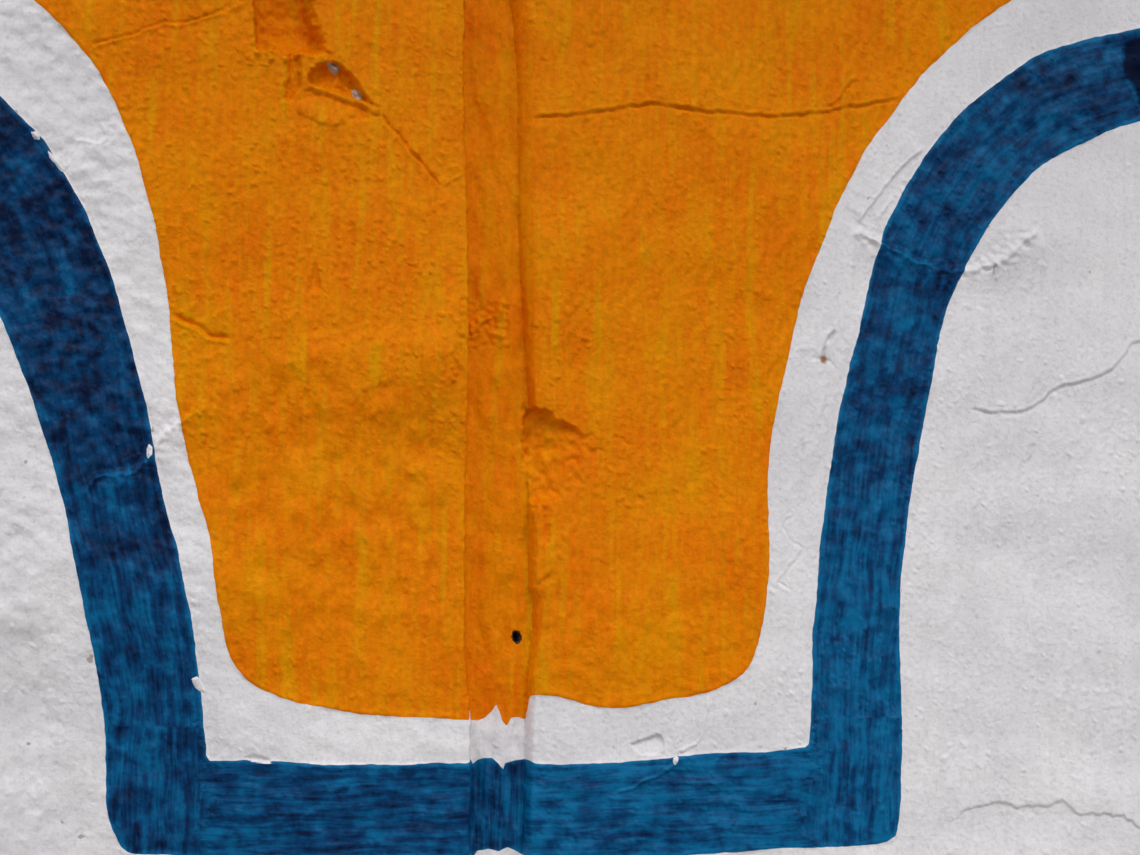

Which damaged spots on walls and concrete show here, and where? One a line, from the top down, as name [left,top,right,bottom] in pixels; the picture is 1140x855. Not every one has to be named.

spalling [252,0,382,128]
crack [524,70,909,123]
crack [840,221,1046,278]
crack [964,336,1140,418]
crack [79,394,205,497]